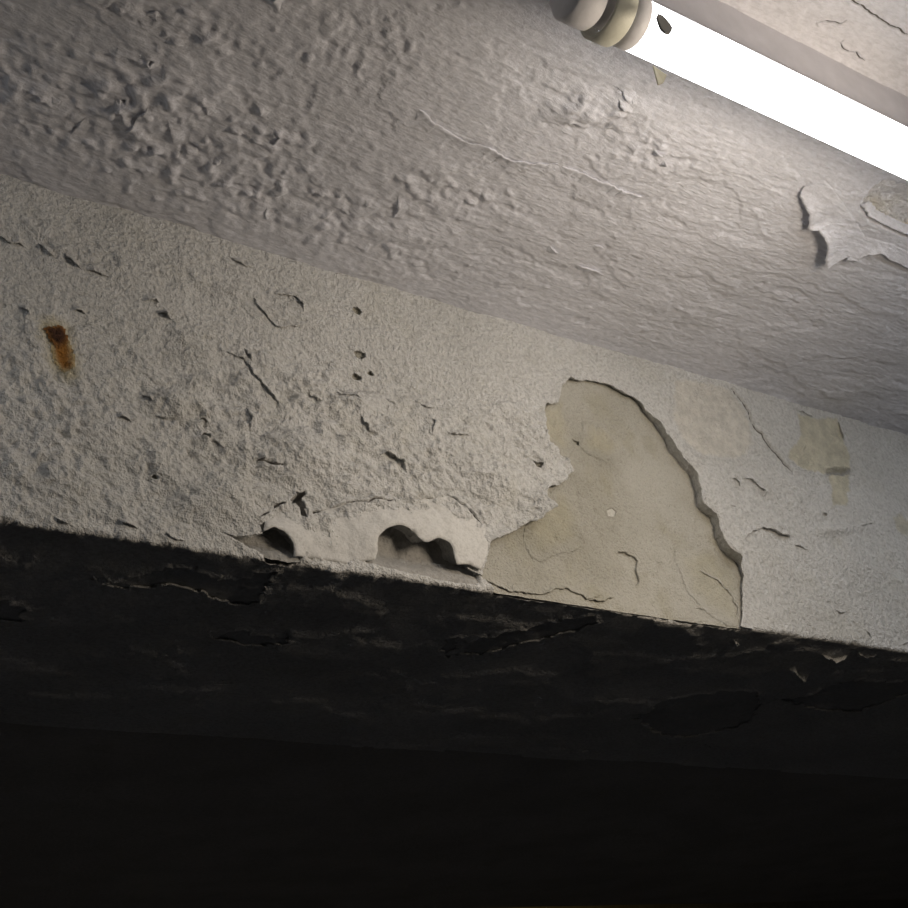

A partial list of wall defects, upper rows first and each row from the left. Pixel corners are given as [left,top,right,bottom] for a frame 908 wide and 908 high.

crack [816,0,908,64]
peeling [799,179,908,269]
rust [24,306,95,392]
spalling [335,346,378,399]
crack [731,388,793,474]
spalling [221,368,754,647]